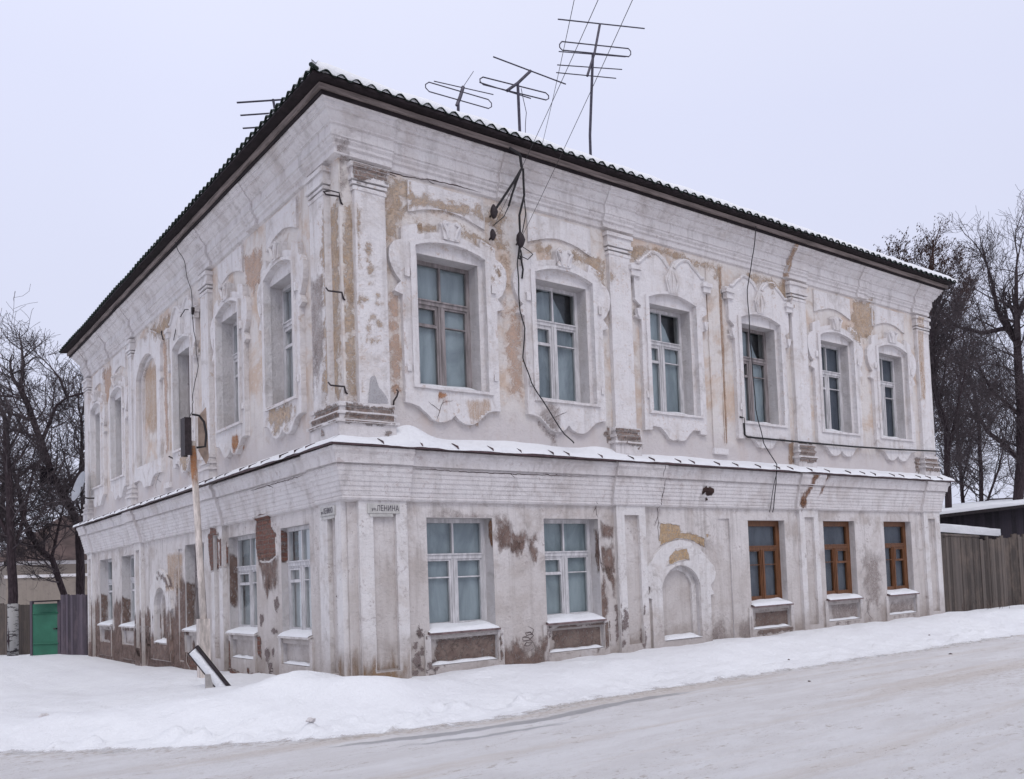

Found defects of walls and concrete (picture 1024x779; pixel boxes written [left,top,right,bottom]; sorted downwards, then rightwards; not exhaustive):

peeling [309,203,402,436]
peeling [846,299,874,344]
peeling [506,306,523,393]
flaking render [207,527,229,573]
flaking render [253,512,288,565]
peeling [658,522,708,566]